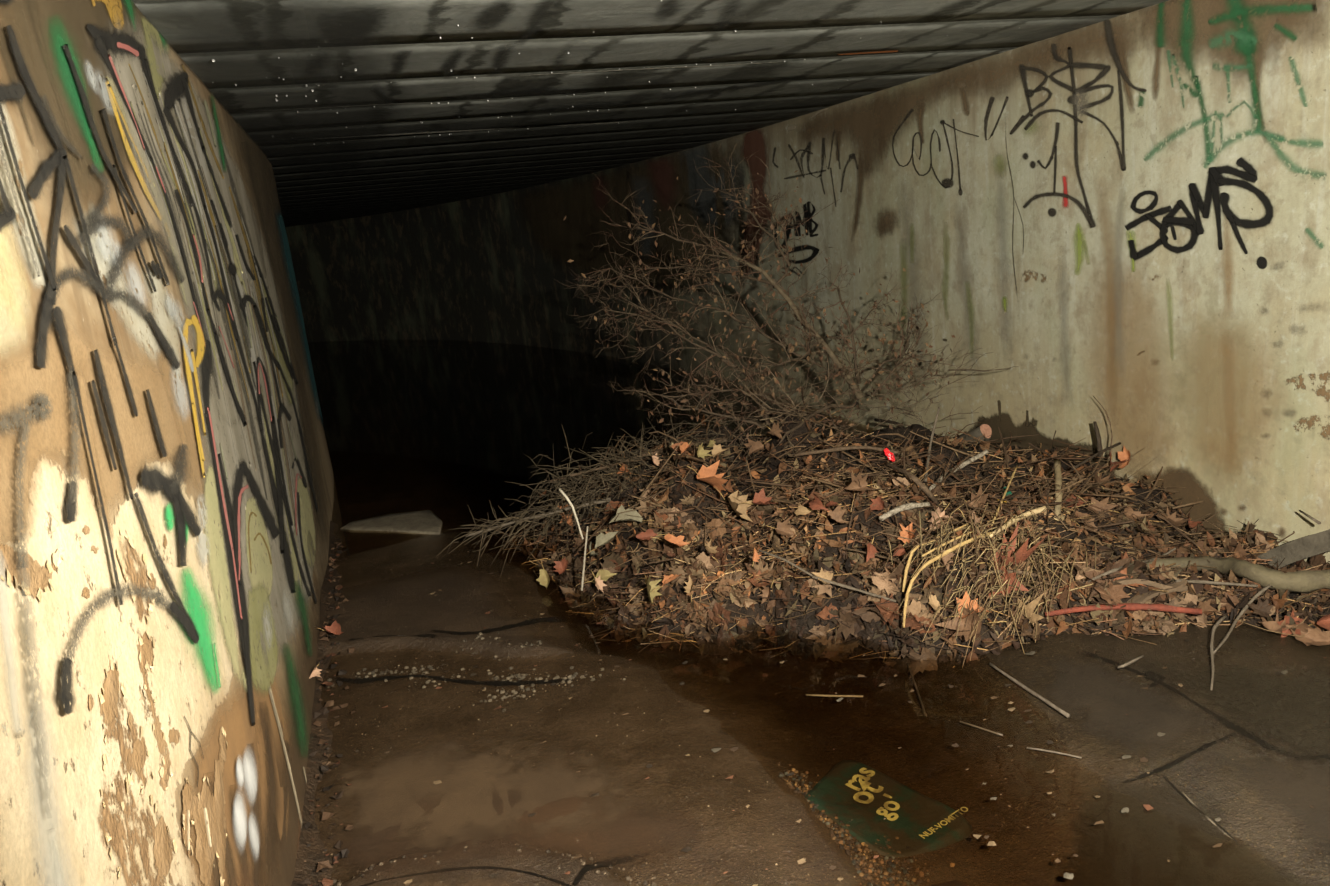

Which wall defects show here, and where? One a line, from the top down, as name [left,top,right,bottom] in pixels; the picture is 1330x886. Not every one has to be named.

spalling [1286,372,1330,401]
spalling [1294,415,1330,439]
peeling [0,544,65,602]
peeling [89,529,228,886]